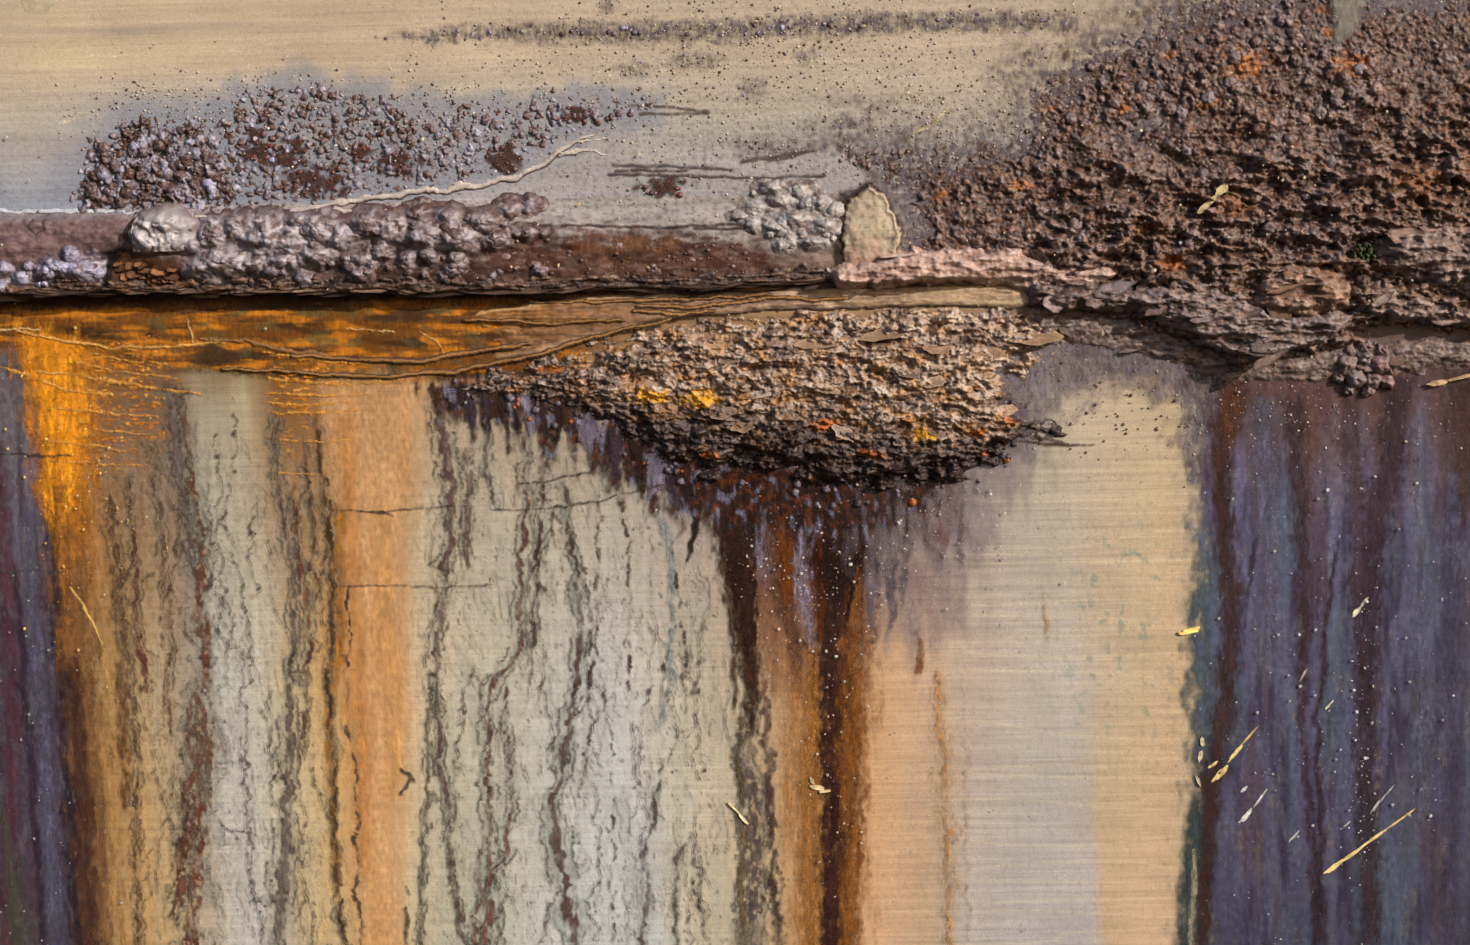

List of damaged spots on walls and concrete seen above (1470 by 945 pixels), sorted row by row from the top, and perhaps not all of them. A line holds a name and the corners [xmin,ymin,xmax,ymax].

rust [241,127,425,201]
rust [375,0,1470,368]
damp [0,345,229,945]
crack [111,413,513,945]
rust [0,225,1105,945]
crack [496,471,735,850]
crack [683,823,711,945]
damp [994,340,1470,945]